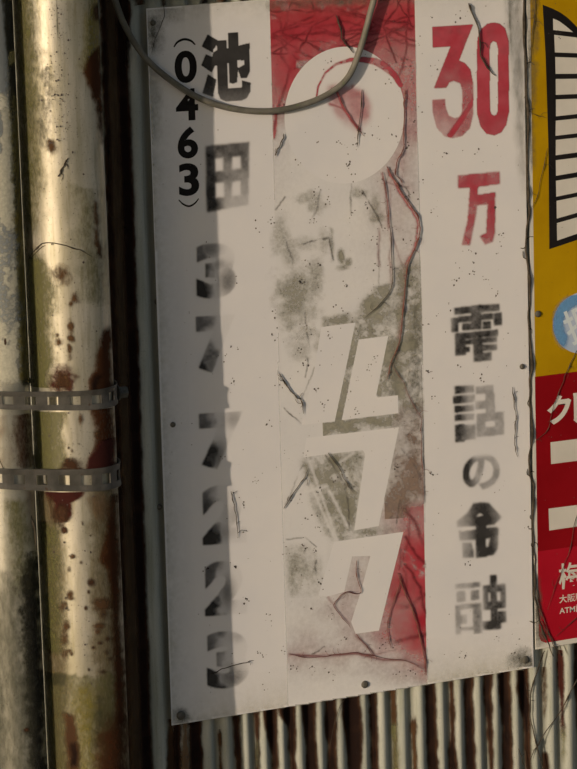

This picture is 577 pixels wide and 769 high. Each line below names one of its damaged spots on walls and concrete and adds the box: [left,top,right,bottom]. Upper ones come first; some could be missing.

peeling [0,0,9,97]
corrosion [53,267,67,284]
corrosion [50,322,76,391]
corrosion [60,0,154,769]
corrosion [45,492,84,534]
corrosion [167,719,204,769]
corrosion [232,715,242,769]
corrosion [253,693,379,769]
corrosion [425,683,439,769]
corrosion [448,668,531,769]
corrosion [557,650,565,730]